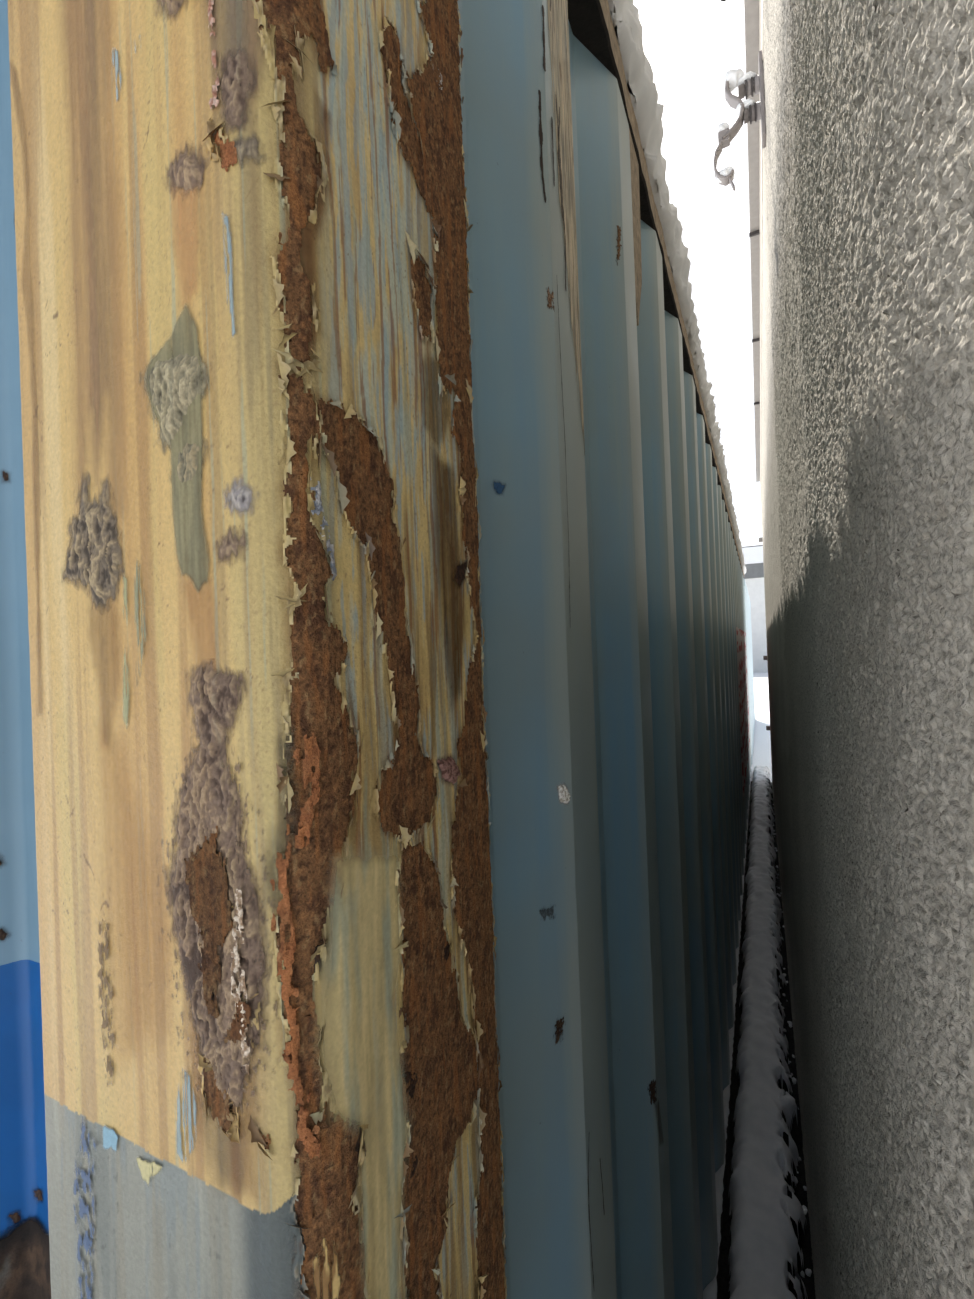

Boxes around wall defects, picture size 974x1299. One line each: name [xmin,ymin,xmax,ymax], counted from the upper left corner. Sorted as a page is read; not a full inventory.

water stain [208,0,261,72]
peeling [538,0,585,450]
rust [252,0,507,1299]
rust [198,993,273,1185]
rust [647,1079,663,1140]
rust [0,1212,51,1299]